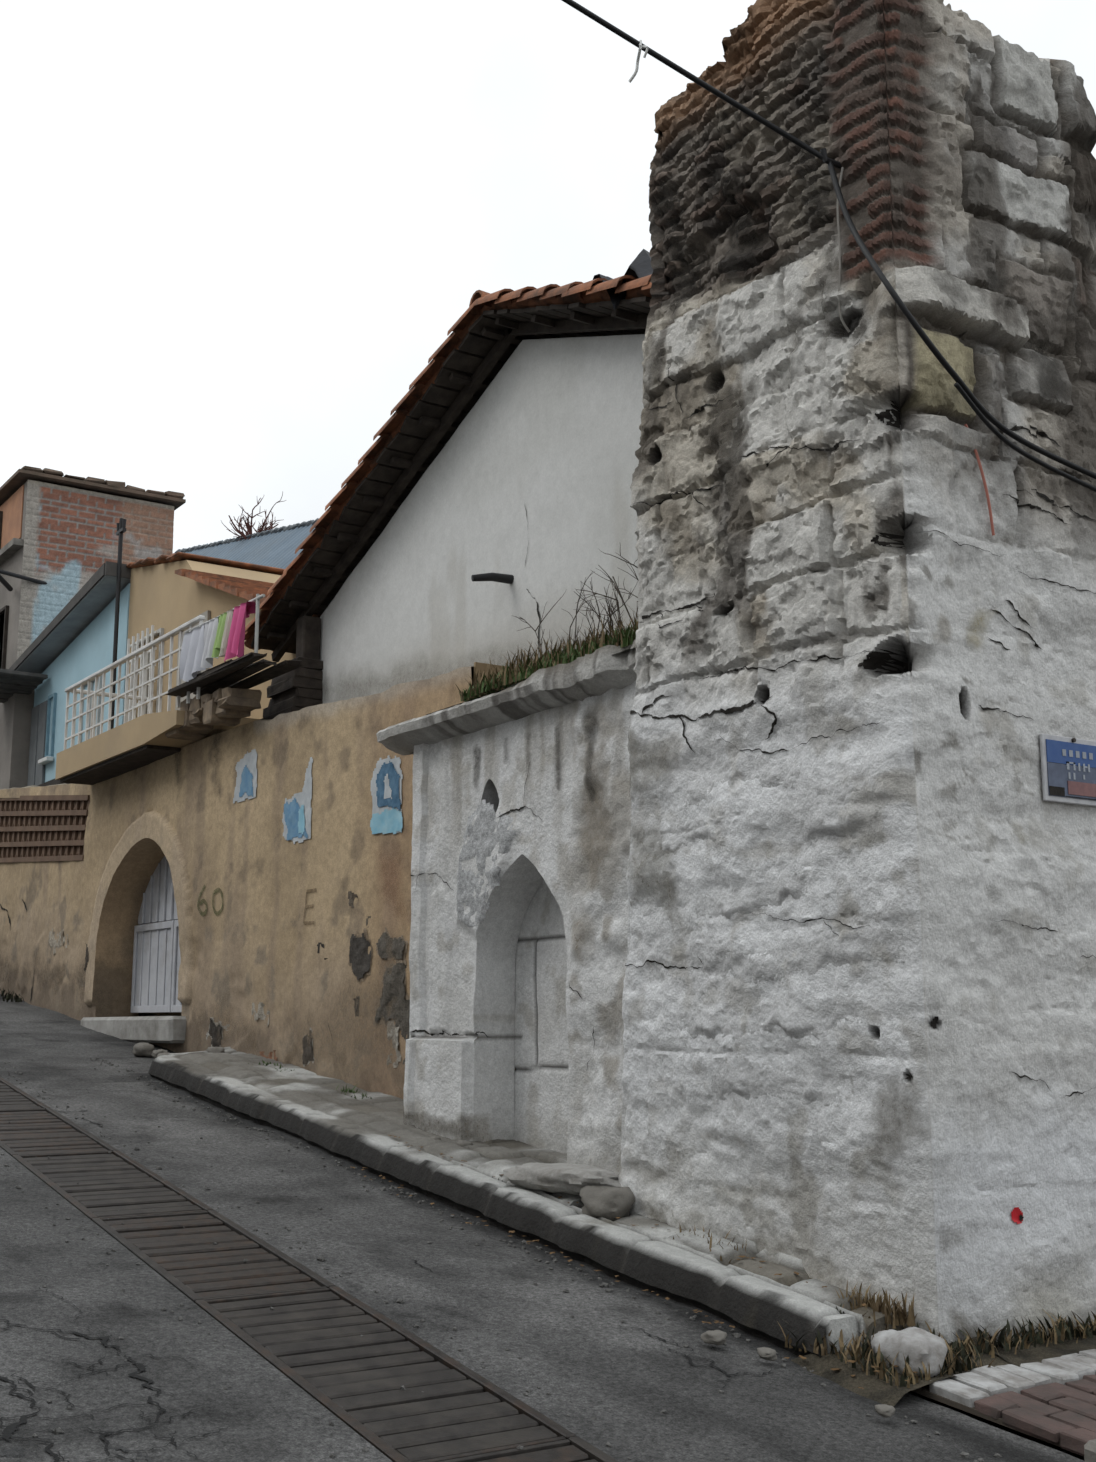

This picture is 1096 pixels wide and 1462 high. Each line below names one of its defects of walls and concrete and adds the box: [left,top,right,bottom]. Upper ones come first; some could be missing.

crack [630,650,879,754]
spalling [348,891,410,1069]